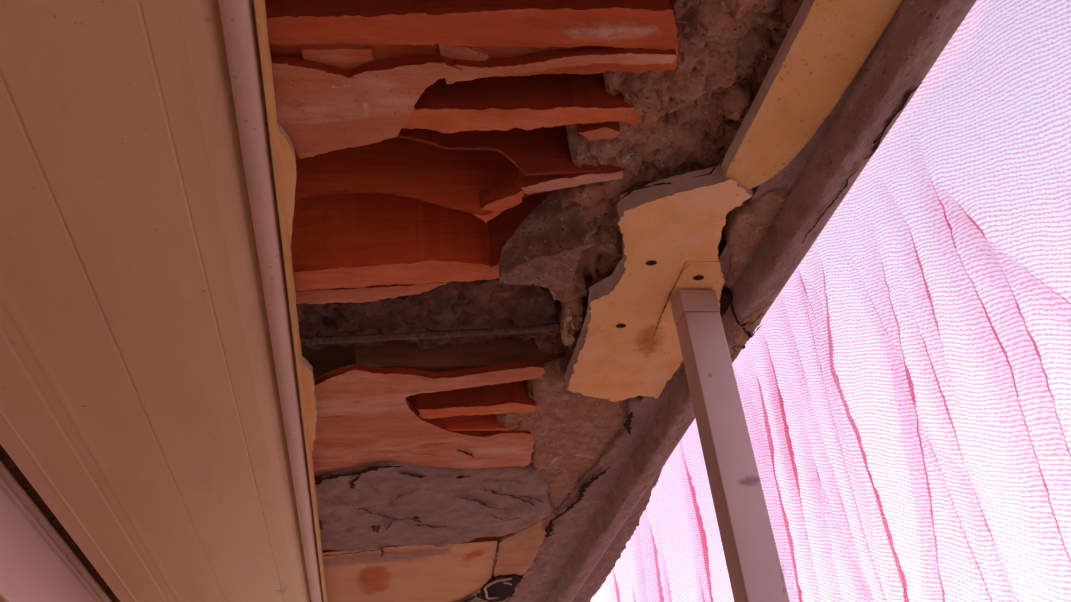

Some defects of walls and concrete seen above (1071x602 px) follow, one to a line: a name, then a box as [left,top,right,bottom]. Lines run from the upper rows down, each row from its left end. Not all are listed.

spalling [300,0,804,602]
crack [624,412,633,435]
crack [315,449,610,602]